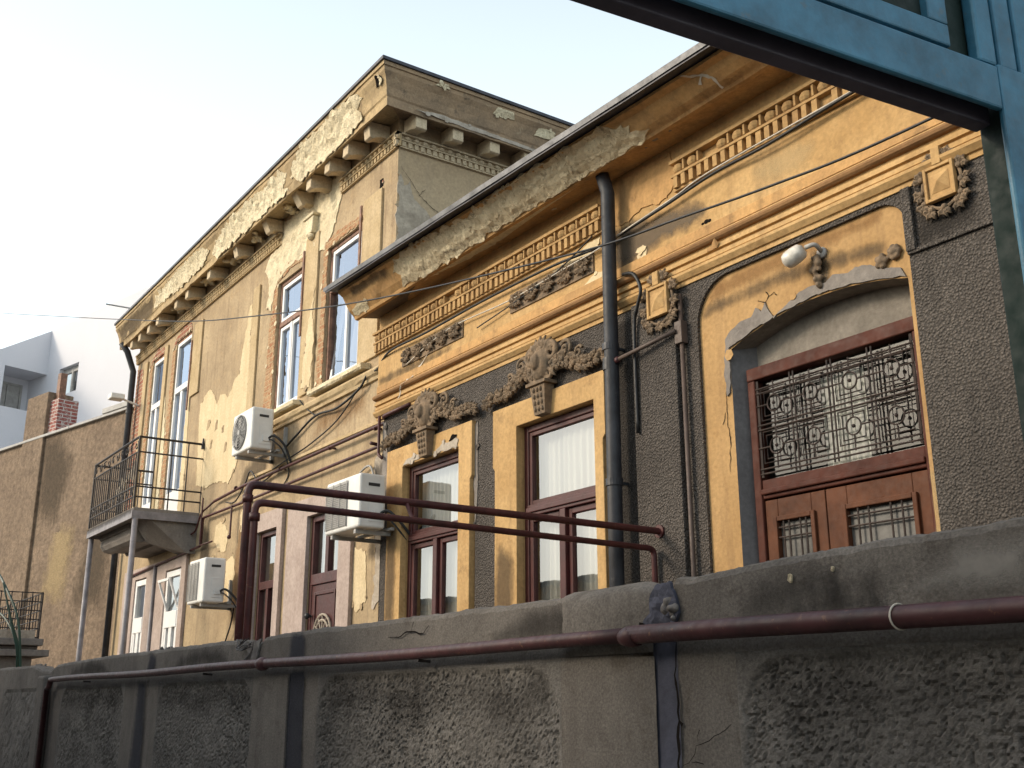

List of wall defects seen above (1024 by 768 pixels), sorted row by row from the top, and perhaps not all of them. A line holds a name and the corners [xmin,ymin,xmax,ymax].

spalling [154,94,363,309]
spalling [392,110,658,287]
spalling [261,176,363,409]
spalling [352,298,369,315]
peeling [724,265,907,396]
peeling [177,304,253,511]
crack [723,396,731,462]
spalling [351,530,381,613]
crack [389,622,429,638]